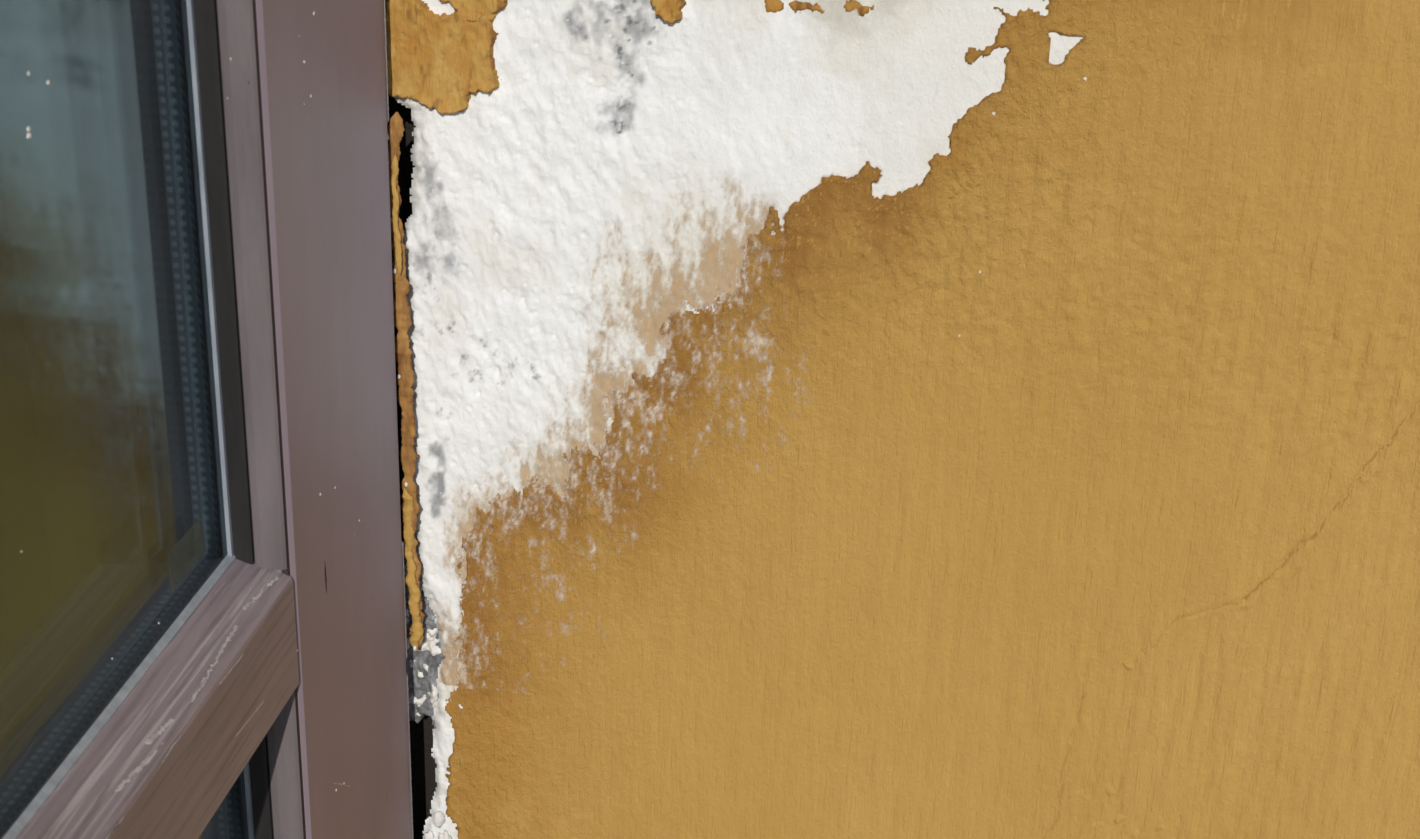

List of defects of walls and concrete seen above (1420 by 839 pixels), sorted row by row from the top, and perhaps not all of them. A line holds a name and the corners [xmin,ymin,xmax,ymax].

peeling [385,0,1083,839]